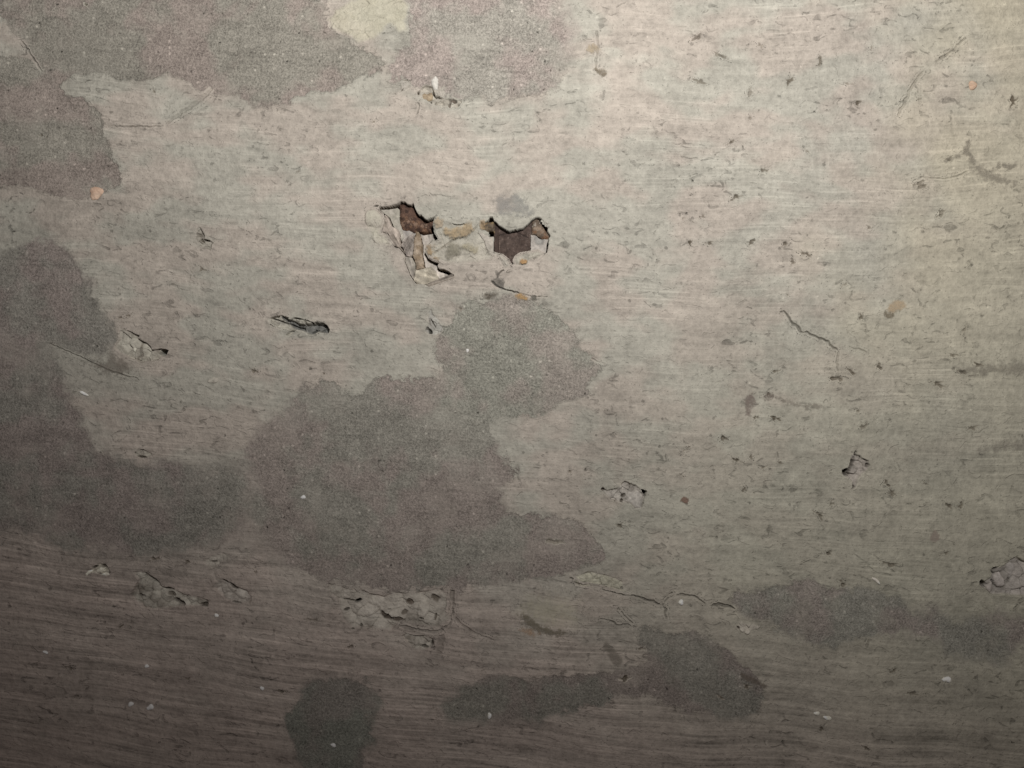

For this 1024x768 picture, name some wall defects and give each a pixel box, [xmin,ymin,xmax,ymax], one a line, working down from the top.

corrosion [399,204,495,260]
spalling [378,200,552,288]
corrosion [532,220,550,240]
crack [779,308,869,374]
peeling [0,230,607,596]
peeling [725,553,1024,674]